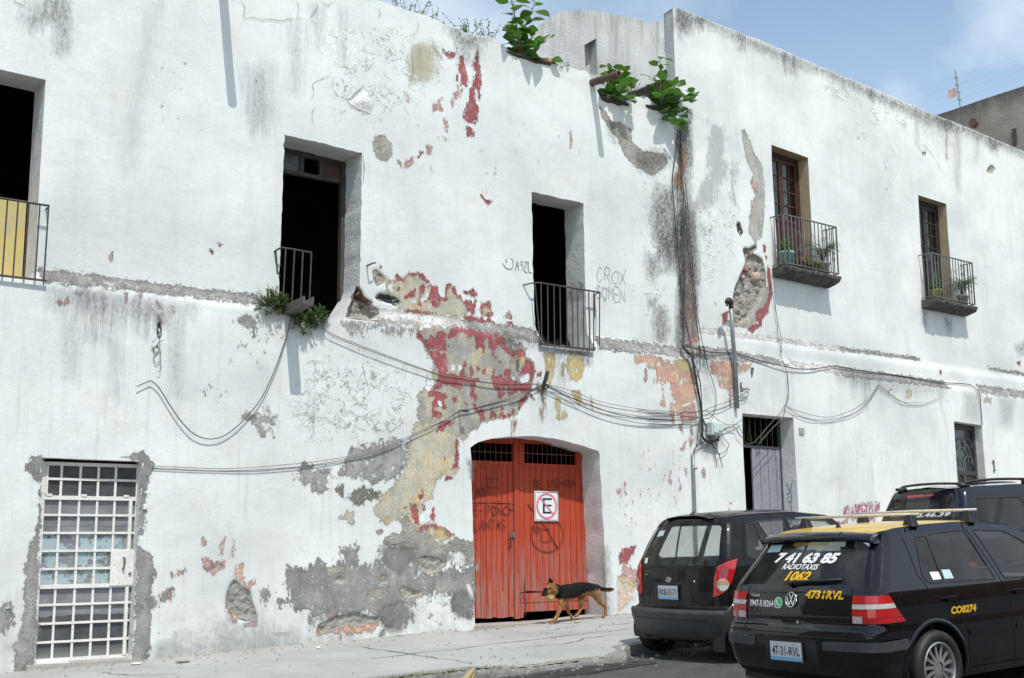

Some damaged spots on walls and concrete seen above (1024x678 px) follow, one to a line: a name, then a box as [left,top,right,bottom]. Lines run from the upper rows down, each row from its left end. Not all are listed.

peeling [432,48,482,141]
flaking render [599,107,668,175]
leakage [650,119,735,342]
peeling [200,265,595,641]
spalling [616,129,773,611]